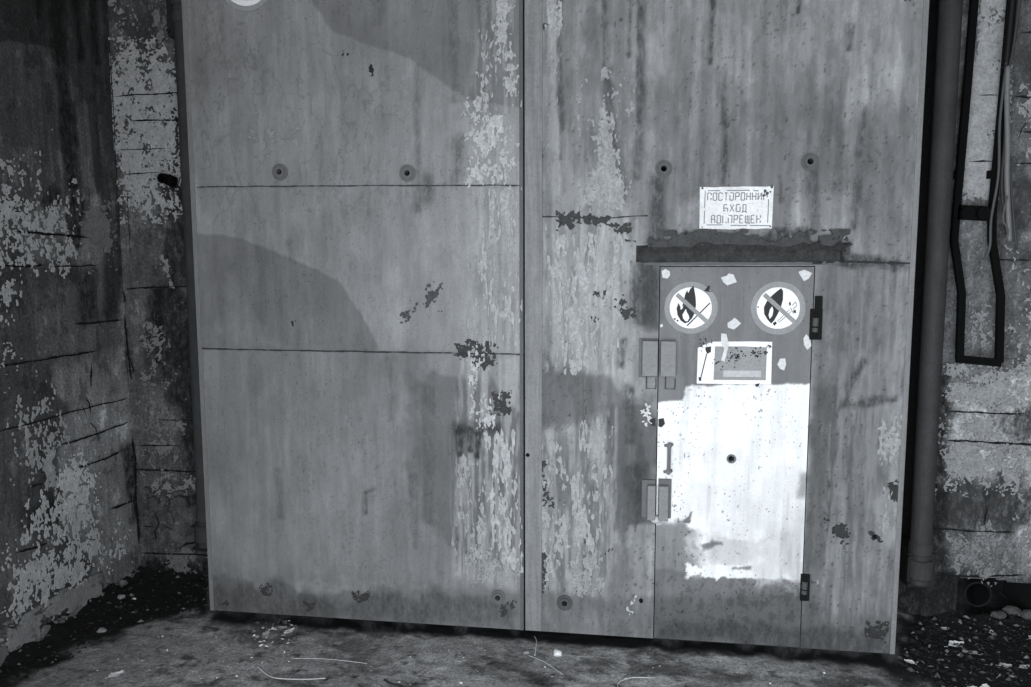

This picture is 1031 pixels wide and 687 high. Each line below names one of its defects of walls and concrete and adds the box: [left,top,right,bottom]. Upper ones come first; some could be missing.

peeling [0,0,183,326]
peeling [949,221,987,255]
peeling [962,0,1031,206]
peeling [0,342,140,667]
peeling [128,315,197,510]
peeling [159,542,201,574]
peeling [935,236,1031,587]